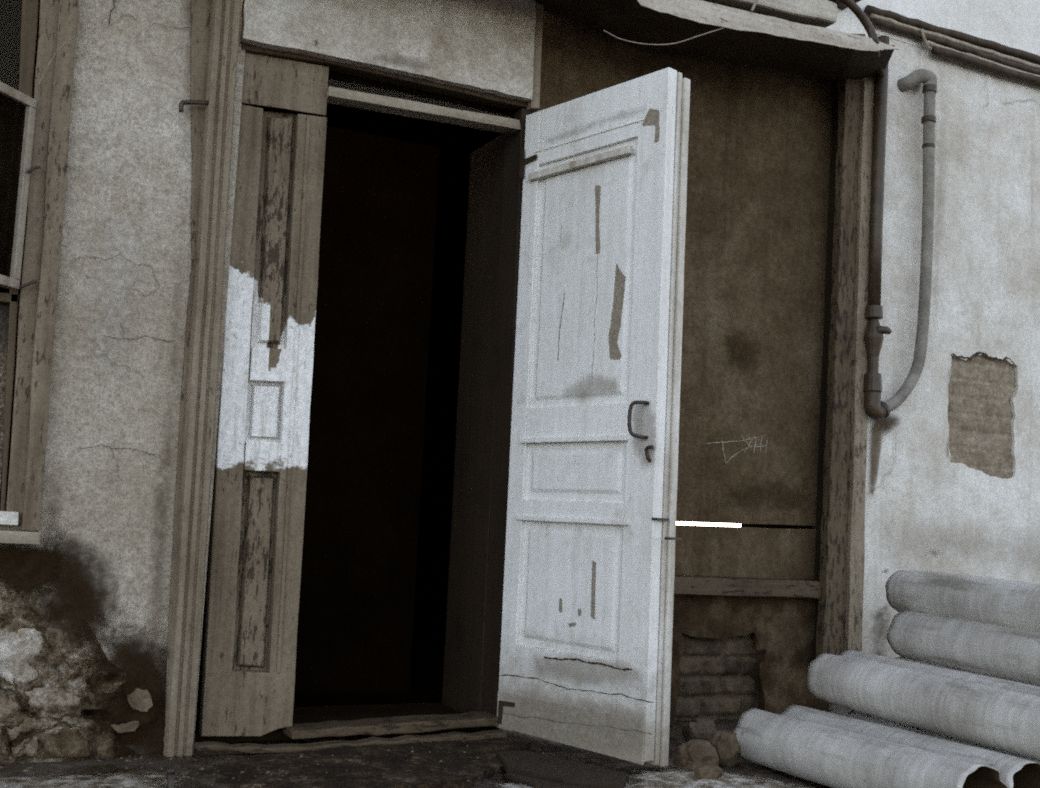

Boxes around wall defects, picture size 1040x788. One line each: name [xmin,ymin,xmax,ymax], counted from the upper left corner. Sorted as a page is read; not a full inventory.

spalling [947,352,1017,479]
spalling [0,579,165,764]
leakage [0,541,167,757]
spalling [675,634,766,720]